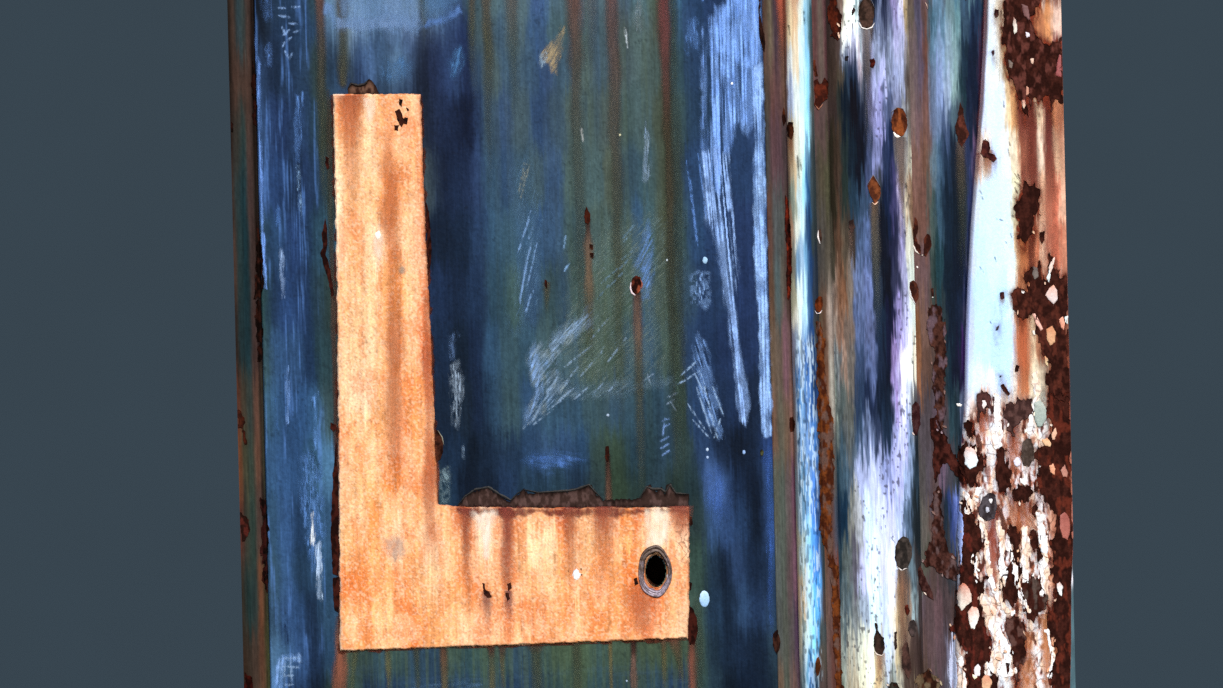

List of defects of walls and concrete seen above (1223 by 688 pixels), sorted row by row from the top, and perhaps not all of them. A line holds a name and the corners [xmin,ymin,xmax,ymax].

corrosion [827,0,842,40]
corrosion [813,60,828,110]
corrosion [316,0,357,497]
corrosion [630,276,643,385]
corrosion [909,0,1073,688]
corrosion [457,446,686,568]
corrosion [815,296,844,688]
peeling [964,447,978,469]
spalling [982,393,1003,450]
spalling [1024,371,1057,446]
spalling [949,486,1070,688]
corrosion [886,642,942,688]